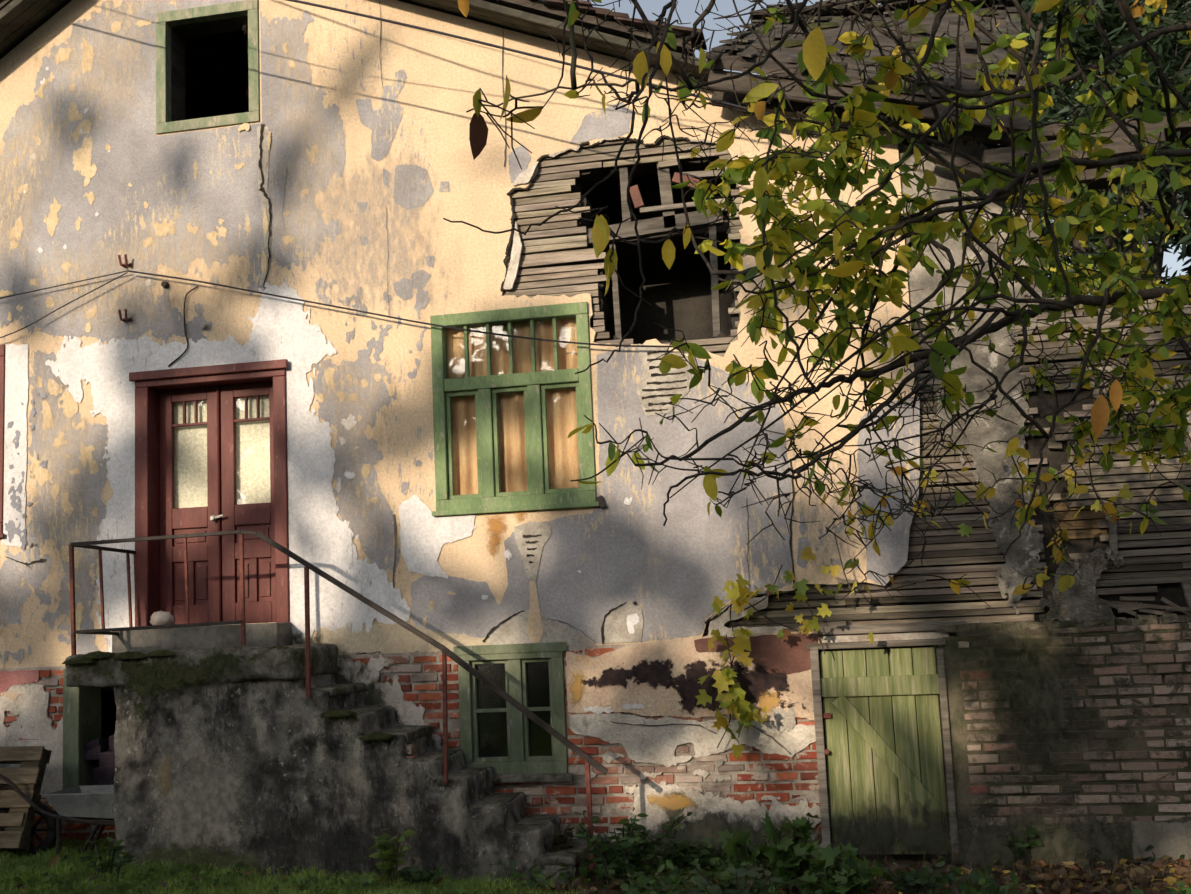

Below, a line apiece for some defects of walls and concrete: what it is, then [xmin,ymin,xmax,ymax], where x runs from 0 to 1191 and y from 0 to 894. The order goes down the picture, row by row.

peeling [0,0,346,344]
crack [238,123,288,286]
peeling [0,350,110,654]
flaking render [0,670,116,846]
damp [150,667,486,878]
peeling [313,356,401,574]
damp [335,655,399,724]
peeling [411,344,823,852]
damp [638,792,1132,867]
peeling [857,397,920,586]
damp [989,622,1095,768]
flaking render [898,139,1191,826]